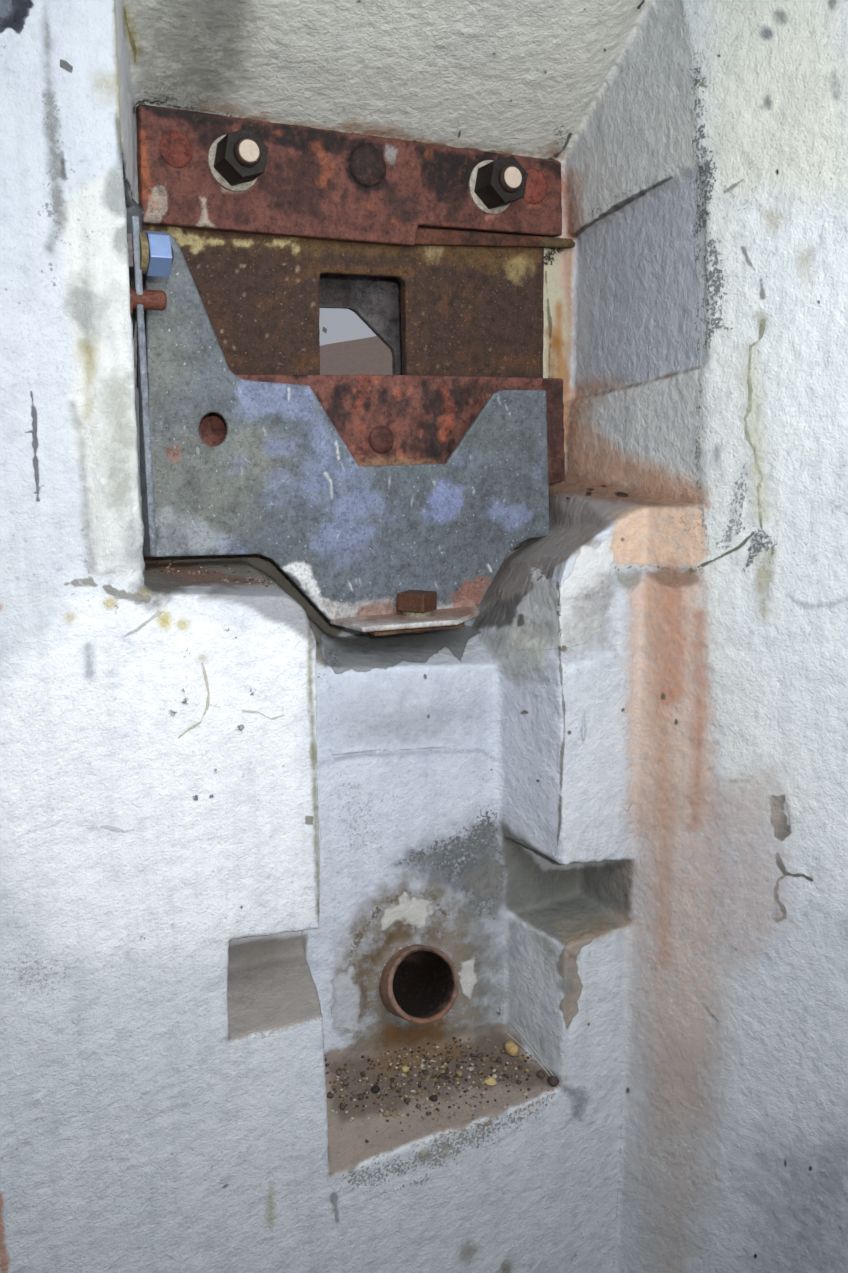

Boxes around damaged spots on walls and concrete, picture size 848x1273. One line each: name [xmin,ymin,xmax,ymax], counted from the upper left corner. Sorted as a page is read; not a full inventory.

spalling [0,0,33,33]
water stain [133,0,239,114]
water stain [464,122,573,162]
corrosion [561,178,576,237]
crack [615,246,777,610]
corrosion [551,452,714,1105]
spalling [770,795,791,841]
water stain [331,804,507,1043]
crack [774,853,813,922]
peeling [557,926,602,1028]